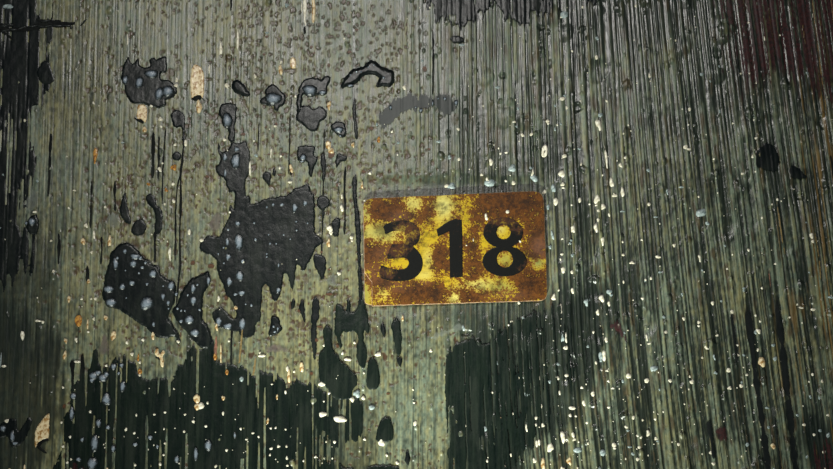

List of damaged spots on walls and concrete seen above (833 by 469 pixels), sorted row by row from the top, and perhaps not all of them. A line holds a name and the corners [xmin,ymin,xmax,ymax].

peeling [426,0,560,43]
peeling [121,56,187,172]
peeling [190,64,210,113]
peeling [225,79,250,97]
peeling [260,84,286,112]
peeling [341,60,458,143]
peeling [53,103,381,469]
peeling [380,316,404,367]
peeling [444,288,610,469]
peeling [0,414,50,453]
peeling [376,417,394,446]